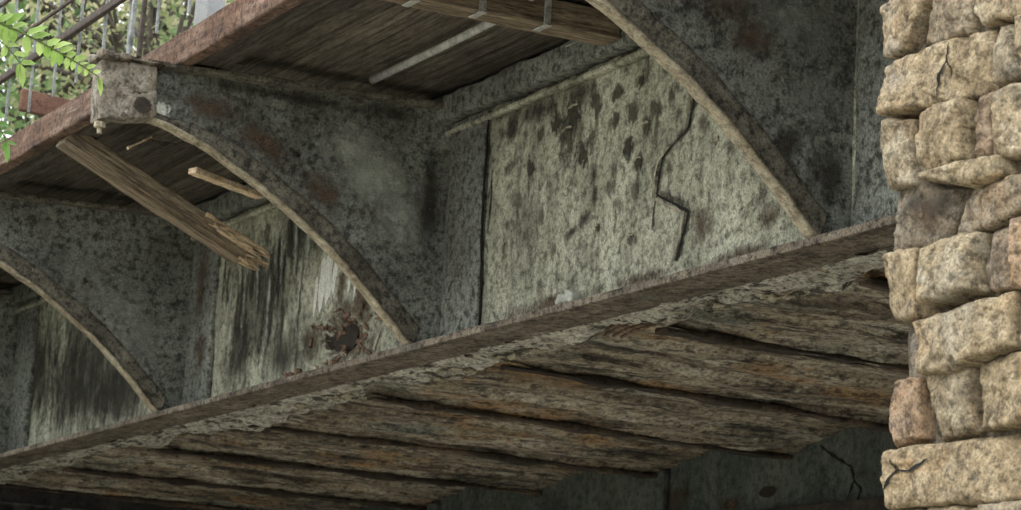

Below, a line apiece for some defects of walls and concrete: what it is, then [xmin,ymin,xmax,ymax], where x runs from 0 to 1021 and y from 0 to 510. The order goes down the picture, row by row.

crack [936,42,952,96]
damp [501,98,555,139]
damp [566,167,596,237]
crack [652,93,697,262]
damp [217,219,315,376]
damp [313,255,356,317]
rust [332,271,369,328]
damp [31,320,138,423]
crack [819,445,927,500]